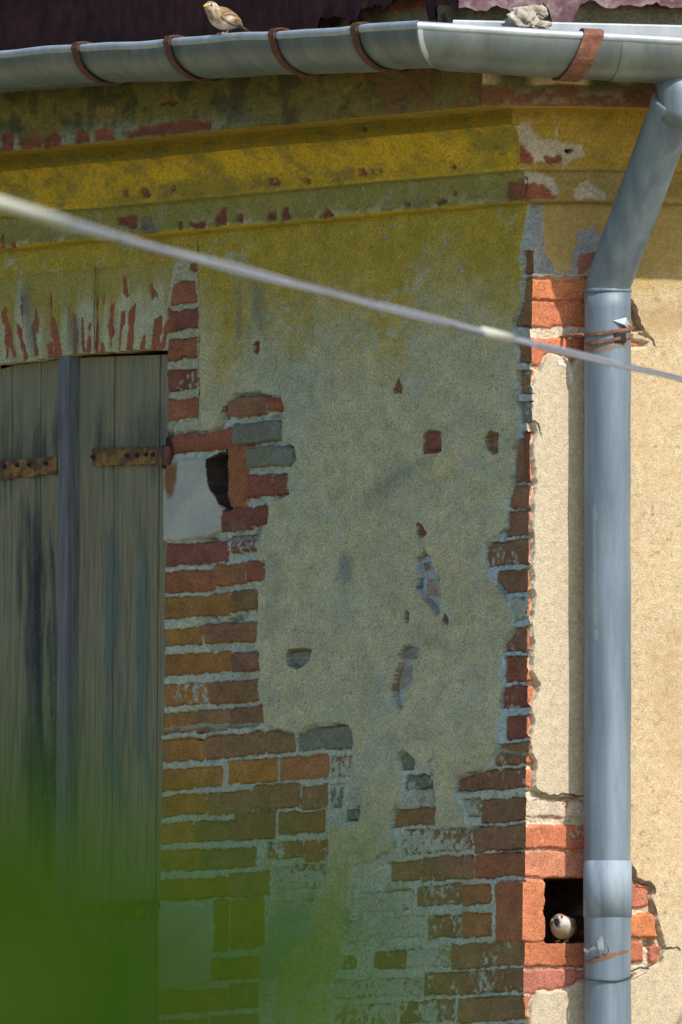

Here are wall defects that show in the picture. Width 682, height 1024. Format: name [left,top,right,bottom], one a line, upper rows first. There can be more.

peeling [572,180,608,201]
flaking render [631,299,650,351]
flaking render [0,259,362,870]
flaking render [350,120,602,1024]
flaking render [631,864,667,982]